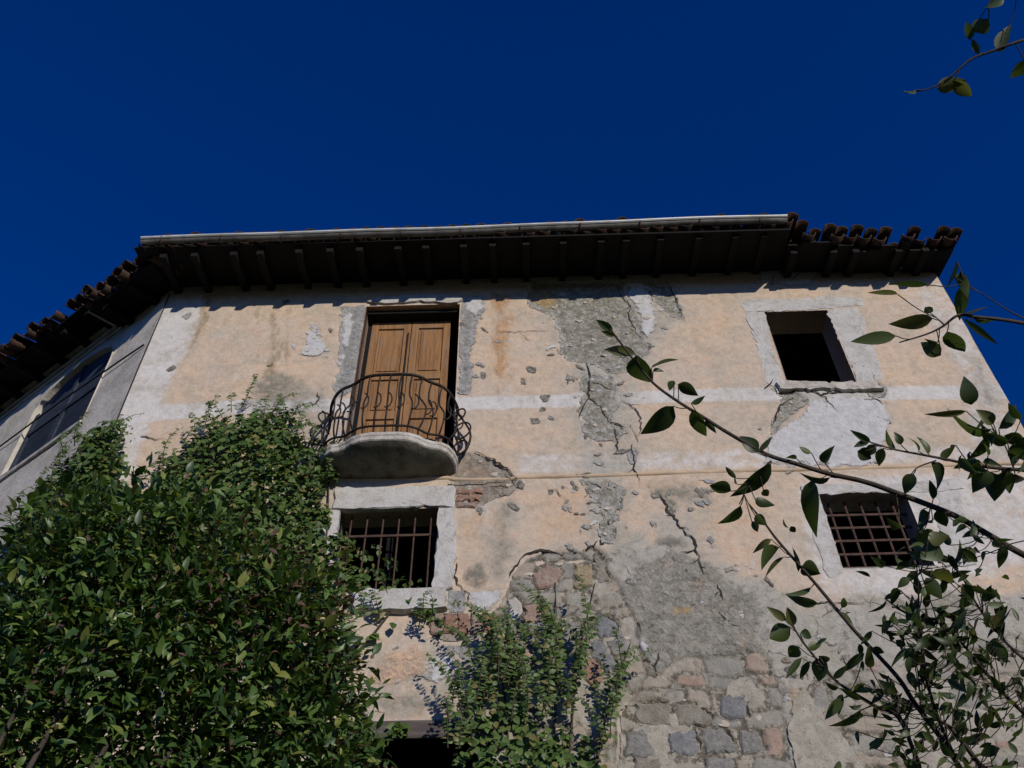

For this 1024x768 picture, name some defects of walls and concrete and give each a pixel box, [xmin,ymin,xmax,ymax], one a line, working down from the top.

crack [509,540,599,577]
crack [579,362,741,634]
flaking render [428,280,1024,768]